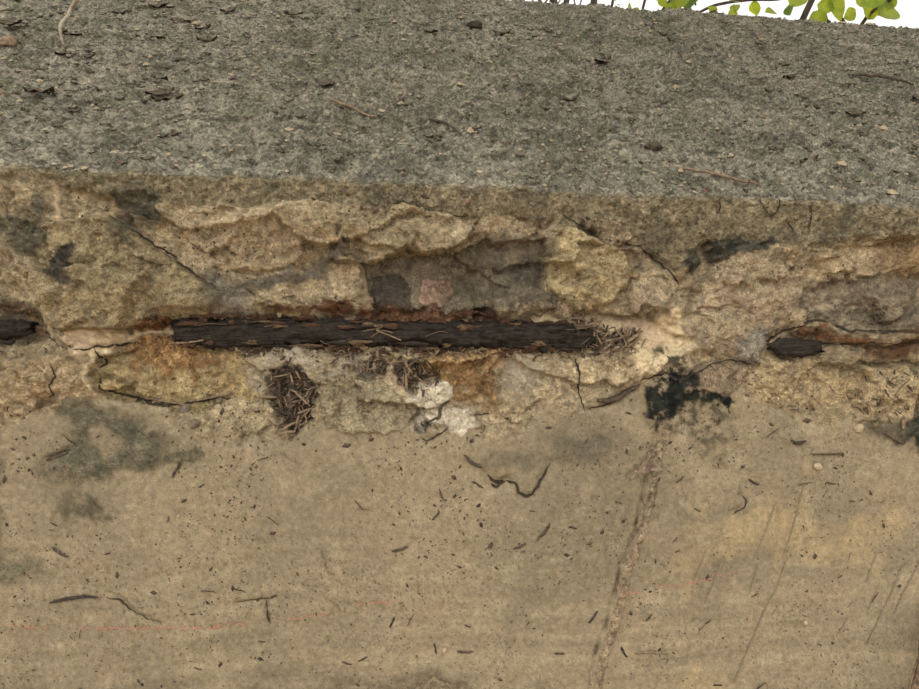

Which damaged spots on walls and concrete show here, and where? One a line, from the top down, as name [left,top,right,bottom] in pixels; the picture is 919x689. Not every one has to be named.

rust [0,303,50,342]
rust [129,299,586,403]
spalling [0,175,718,440]
mould [645,347,735,428]
spalling [678,235,919,429]
rust [789,324,919,359]